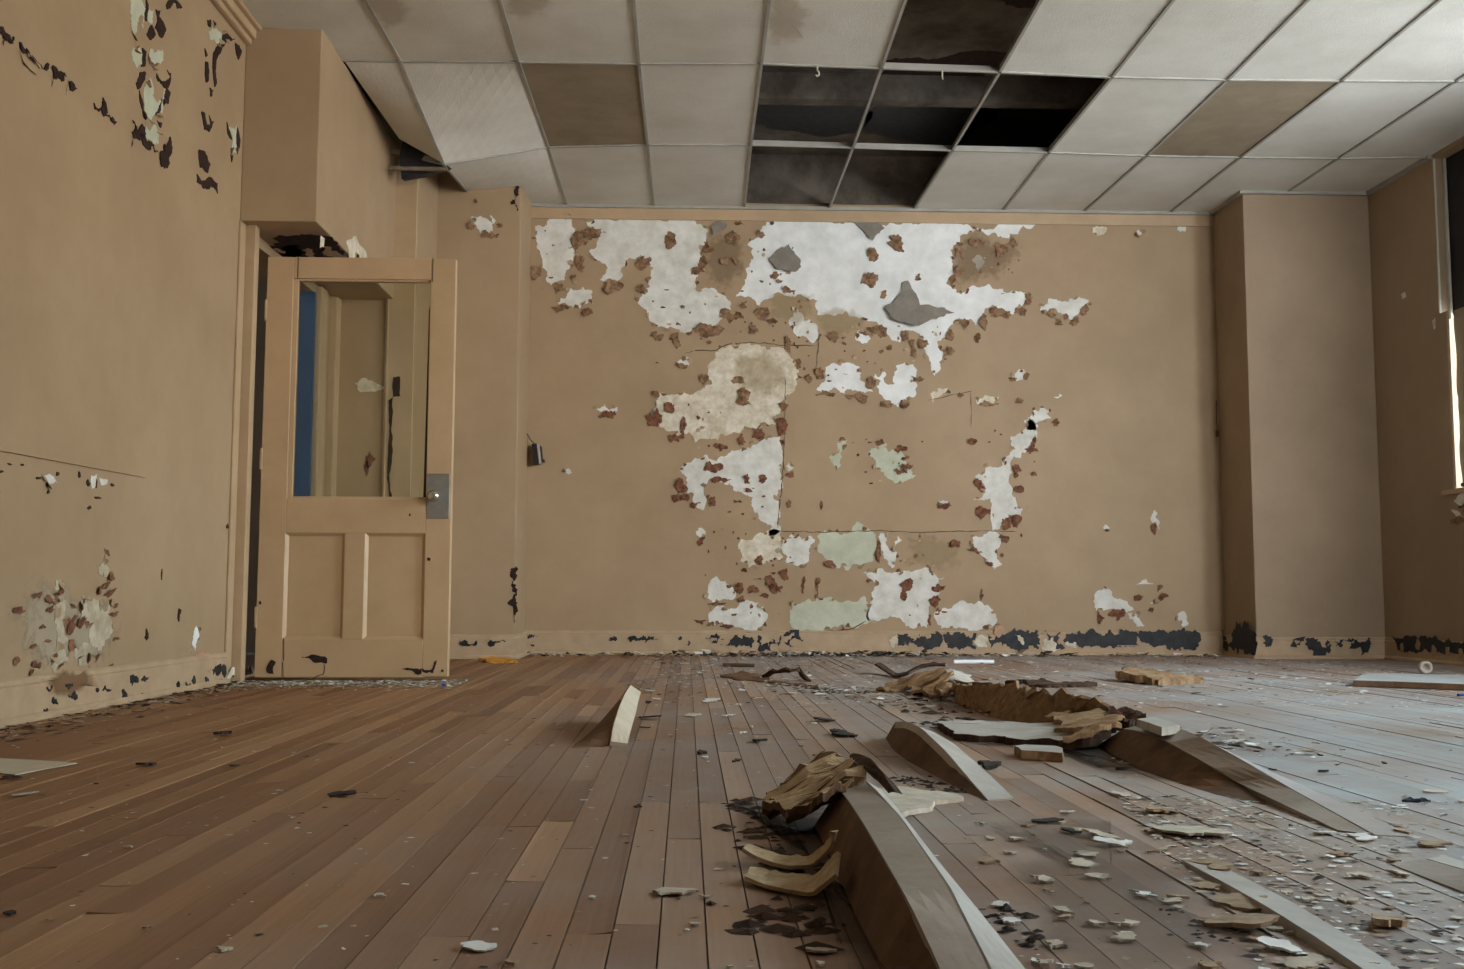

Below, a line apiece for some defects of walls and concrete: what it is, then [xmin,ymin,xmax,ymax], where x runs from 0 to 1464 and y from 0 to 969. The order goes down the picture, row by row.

peeling [0,26,77,92]
peeling [93,0,182,169]
peeling [201,20,242,162]
peeling [197,149,218,194]
peeling [466,199,503,239]
peeling [530,214,1201,652]
peeling [508,567,518,623]
peeling [13,548,121,712]
peeling [1221,621,1273,655]
peeling [1291,637,1371,656]
peeling [1393,635,1464,659]
peeling [96,674,149,698]